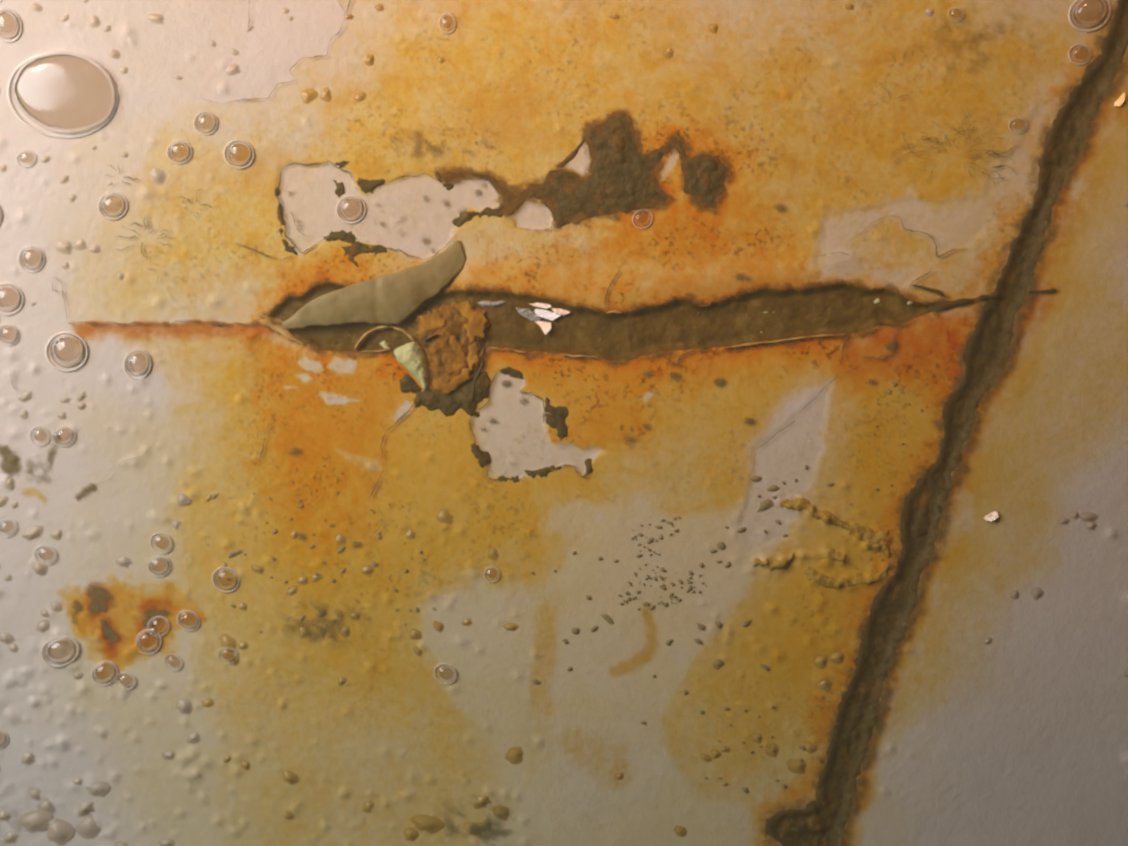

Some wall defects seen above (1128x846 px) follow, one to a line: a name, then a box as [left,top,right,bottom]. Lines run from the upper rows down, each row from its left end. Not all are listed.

peeling [275,161,555,267]
rust [436,110,732,228]
peeling [354,325,430,393]
rust [413,274,946,417]
peeling [469,367,606,483]
rust [76,484,96,500]
rust [73,586,119,642]
rust [143,608,169,633]